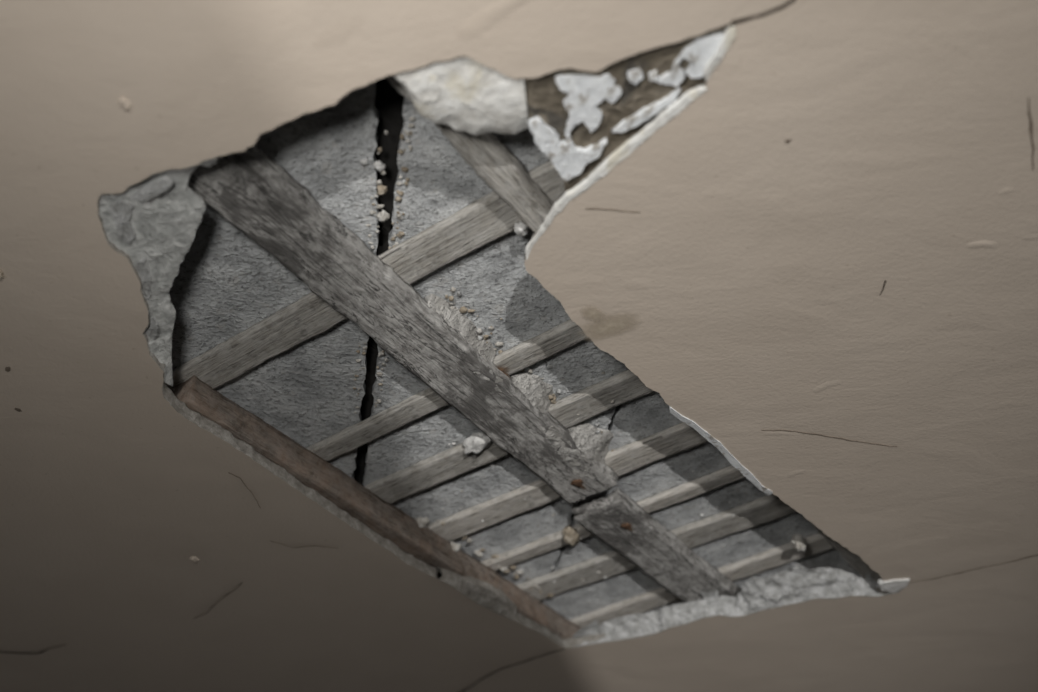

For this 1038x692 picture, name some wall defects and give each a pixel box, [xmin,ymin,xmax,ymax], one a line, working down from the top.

crack [732,0,806,25]
spalling [394,23,736,262]
spalling [98,156,219,386]
spalling [669,406,773,495]
crack [761,430,898,447]
spalling [437,566,517,620]
spalling [572,565,910,647]